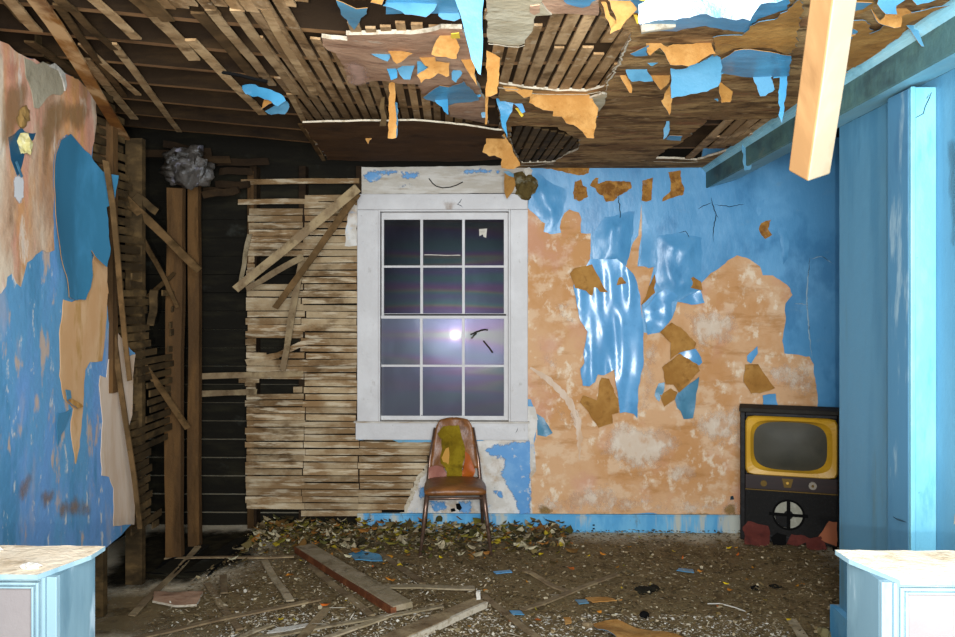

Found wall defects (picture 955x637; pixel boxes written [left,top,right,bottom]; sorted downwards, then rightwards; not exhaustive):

spalling [129,0,473,161]
spalling [483,0,631,111]
peeling [0,0,182,536]
peeling [202,119,818,516]
crack [700,199,743,240]